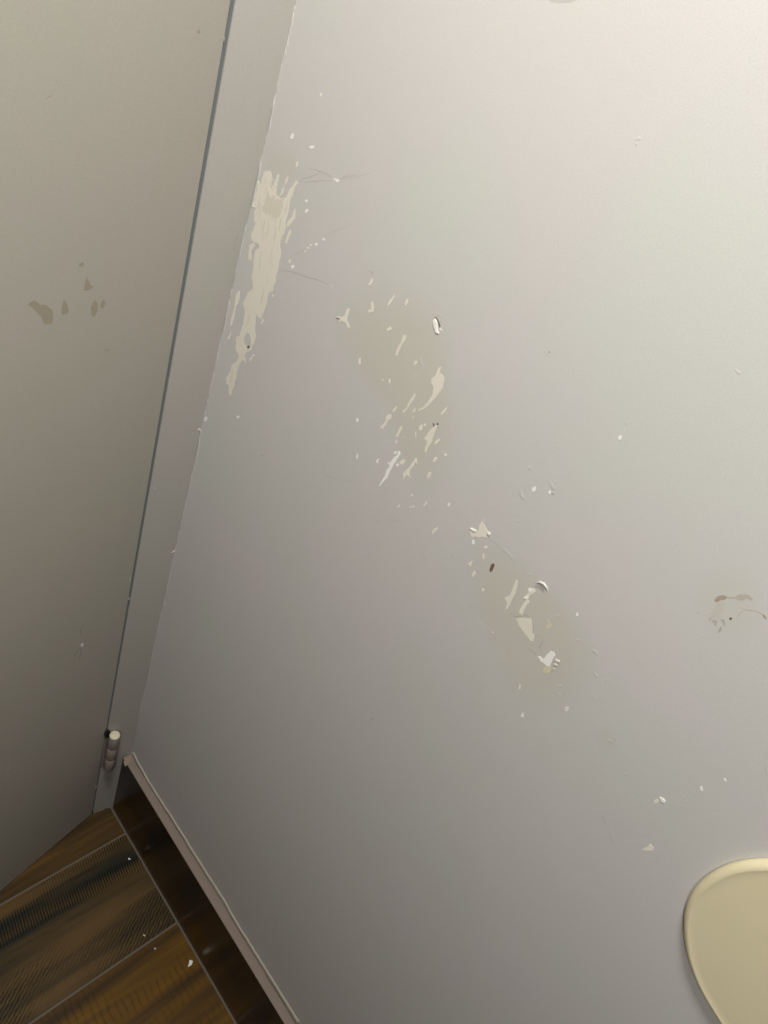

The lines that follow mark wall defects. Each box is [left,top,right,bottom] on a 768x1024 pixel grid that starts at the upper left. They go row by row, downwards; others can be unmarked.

peeling [226,161,308,395]
peeling [376,367,447,486]
peeling [468,521,490,577]
peeling [504,579,535,641]
peeling [538,651,560,674]